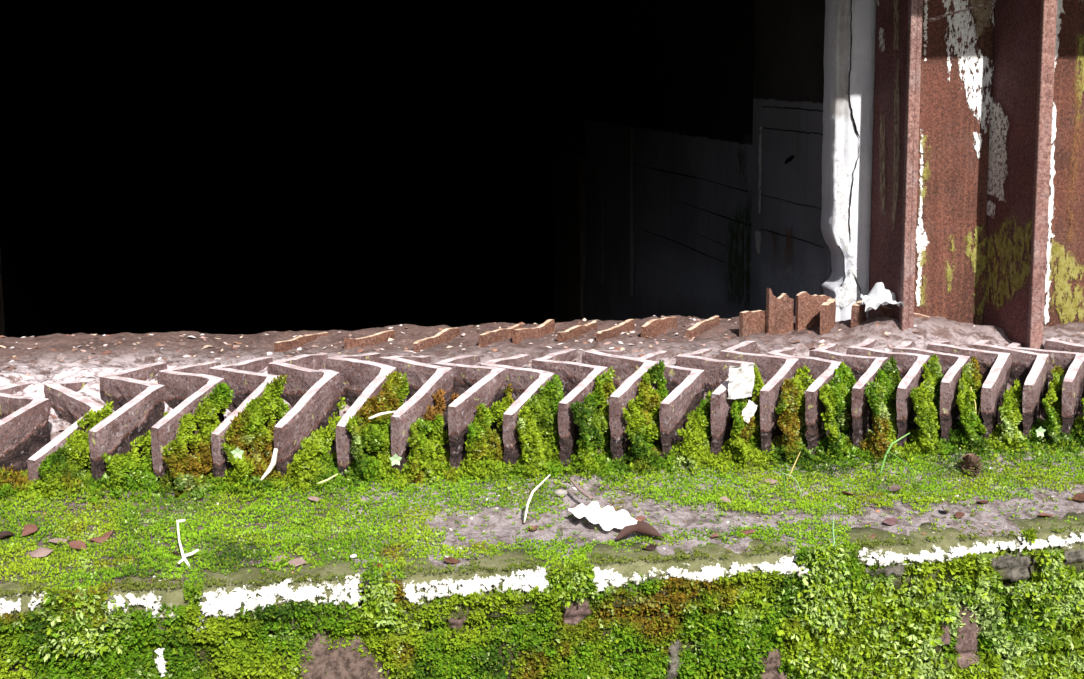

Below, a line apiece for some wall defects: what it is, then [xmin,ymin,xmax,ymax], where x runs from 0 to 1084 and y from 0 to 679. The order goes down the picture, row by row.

peeling [1054,0,1083,72]
crack [762,106,823,135]
crack [847,0,860,241]
corrosion [879,0,900,231]
peeling [942,0,1010,218]
crack [634,164,824,263]
peeling [1044,104,1057,325]
spalling [865,563,905,577]
spalling [990,551,1035,581]
spalling [298,630,389,679]